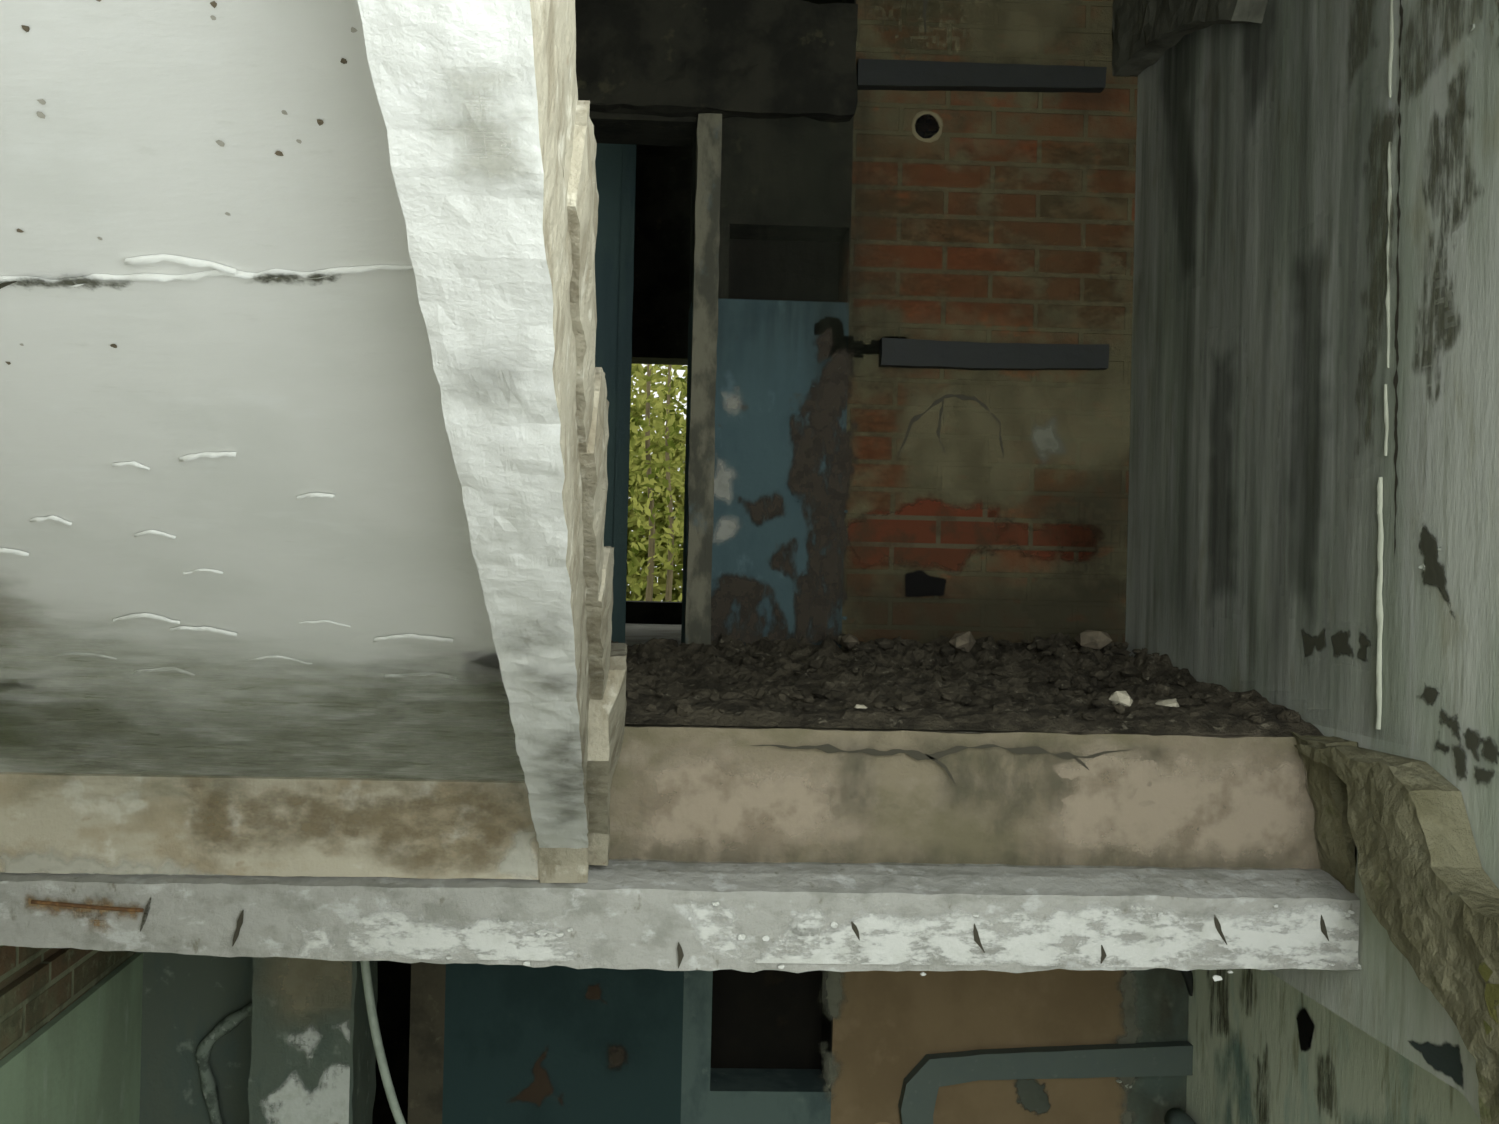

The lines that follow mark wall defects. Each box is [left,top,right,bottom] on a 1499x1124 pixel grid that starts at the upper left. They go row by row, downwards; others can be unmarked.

peeling [1403,0,1499,94]
crack [0,254,414,289]
peeling [1415,70,1476,398]
peeling [711,329,857,645]
damp [0,645,510,780]
damp [195,785,506,869]
rust [26,897,144,928]
peeling [289,1028,320,1056]
peeling [264,1065,350,1124]